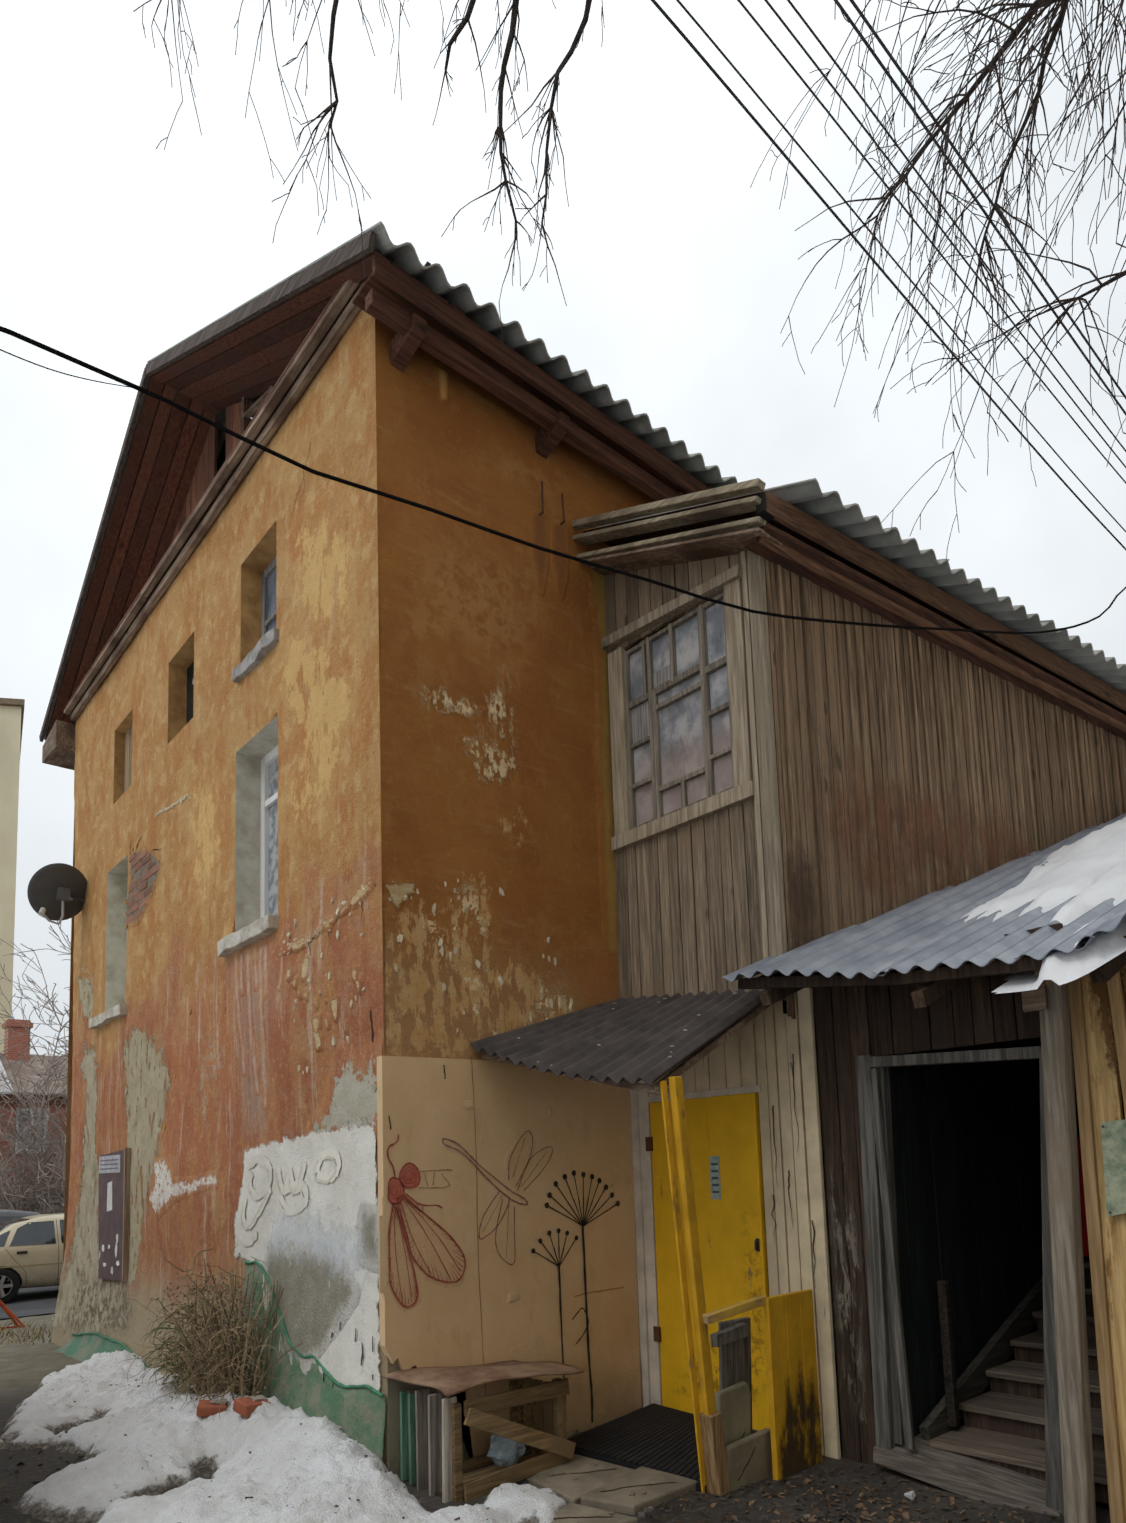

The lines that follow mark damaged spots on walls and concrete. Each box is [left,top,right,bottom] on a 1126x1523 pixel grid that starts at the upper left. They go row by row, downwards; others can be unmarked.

flaking render [125,846,163,929]
flaking render [277,359,604,1145]
peeling [51,965,244,1347]